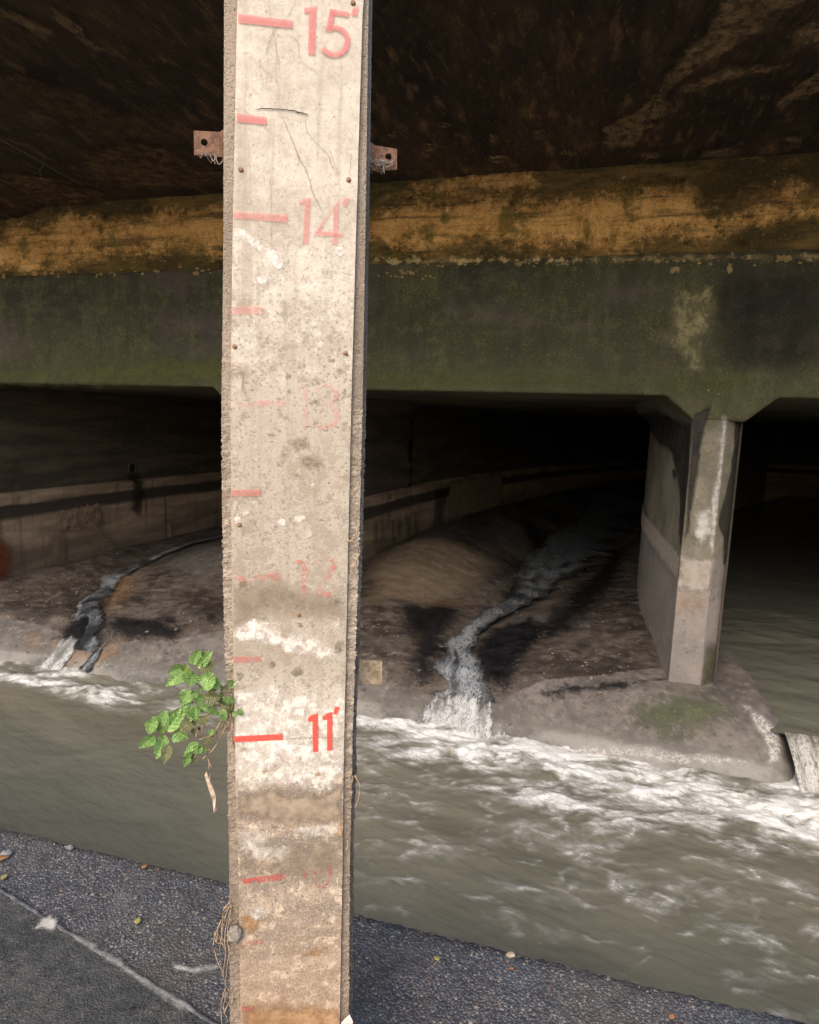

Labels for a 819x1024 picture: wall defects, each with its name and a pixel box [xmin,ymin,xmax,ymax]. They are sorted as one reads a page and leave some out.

crack [240,0,351,210]
damp [671,286,712,370]
damp [641,408,741,591]